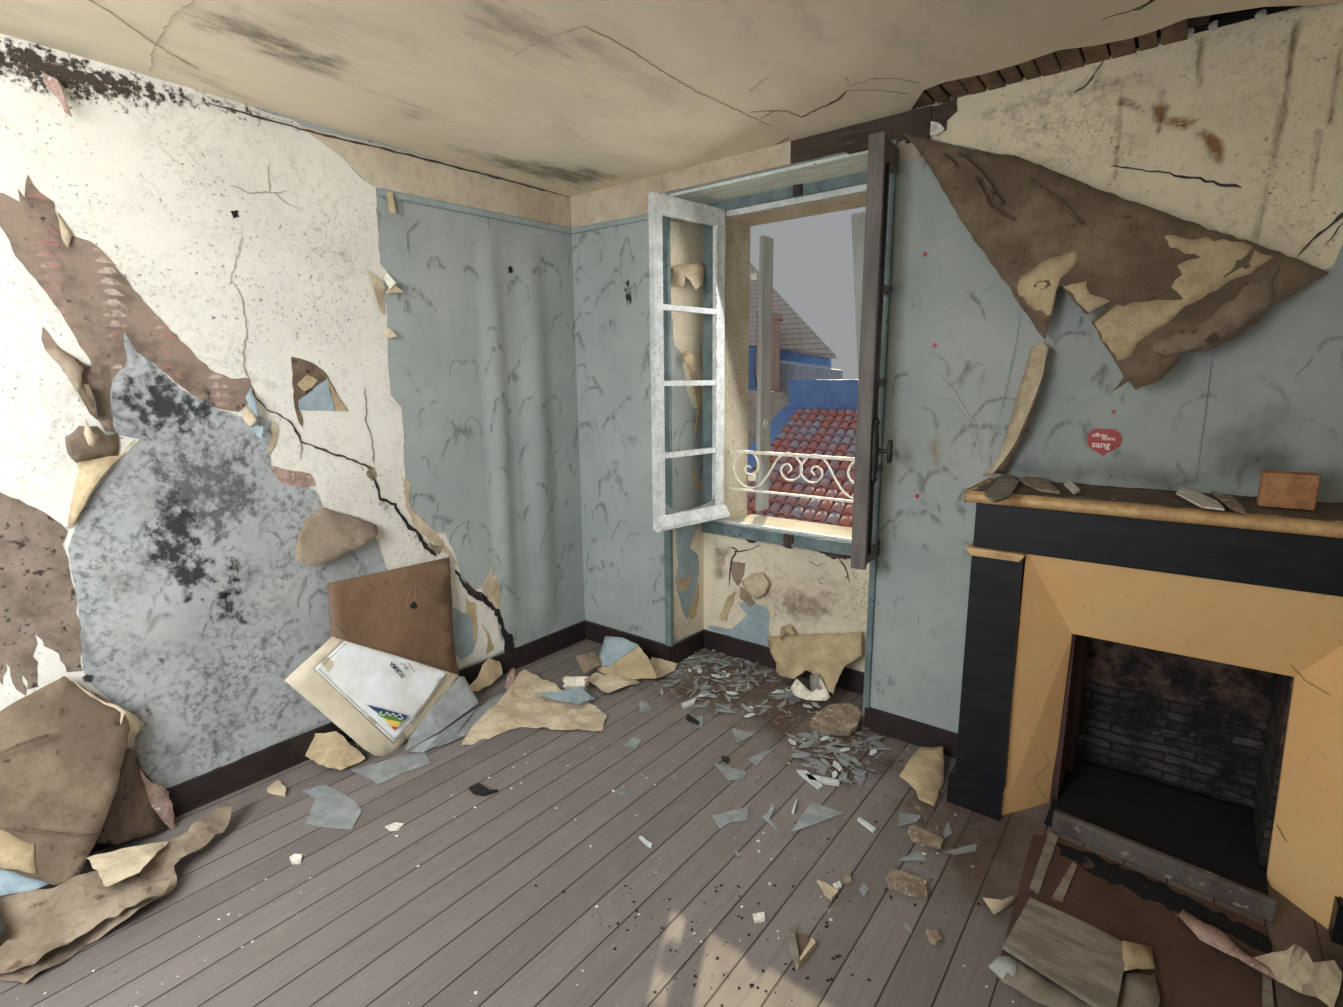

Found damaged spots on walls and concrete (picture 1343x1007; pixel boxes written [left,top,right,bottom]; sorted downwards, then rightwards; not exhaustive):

crack [90,0,197,72]
leakage [0,38,300,130]
crack [514,26,919,144]
crack [1073,60,1104,93]
crack [1101,0,1154,20]
peeling [930,2,1343,270]
leakage [113,367,213,436]
peeling [0,34,514,668]
crack [230,239,508,640]
leakage [145,444,256,624]
peeling [673,523,704,640]
peeling [0,632,111,711]